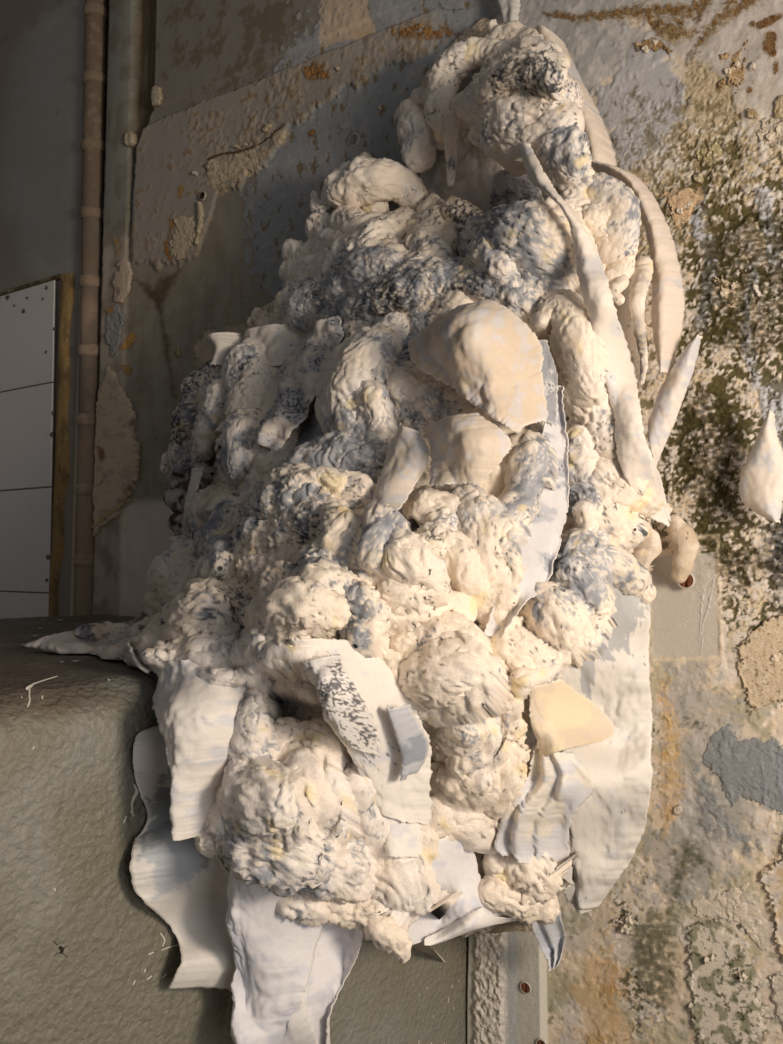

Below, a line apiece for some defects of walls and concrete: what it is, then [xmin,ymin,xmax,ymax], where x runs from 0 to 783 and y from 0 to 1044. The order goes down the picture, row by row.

peeling [497,0,521,24]
peeling [633,37,673,57]
flaking render [112,236,133,304]
flaking render [164,216,197,261]
leakage [698,210,783,357]
flaking render [91,365,140,538]
leakage [678,390,783,589]
peeling [702,723,783,815]
peeling [686,844,783,1044]